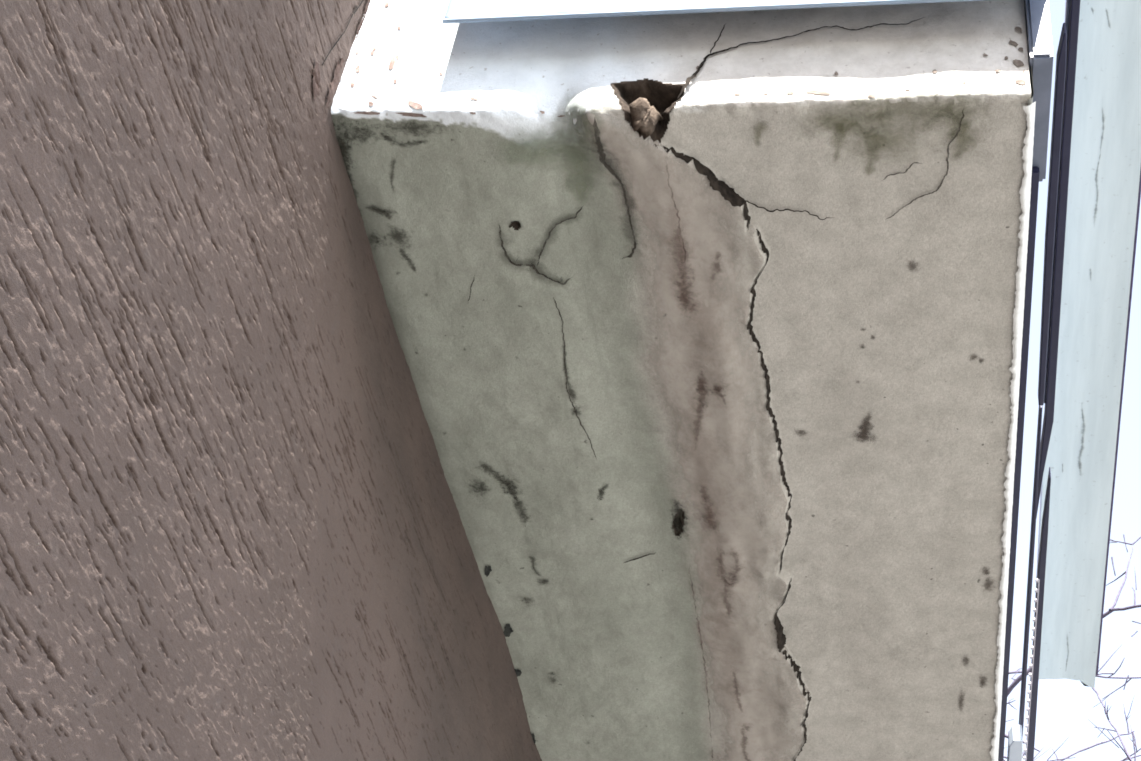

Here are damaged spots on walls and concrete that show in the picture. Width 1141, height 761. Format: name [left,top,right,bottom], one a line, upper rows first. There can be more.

crack [593,117,636,259]
spalling [611,78,685,148]
crack [672,17,924,103]
crack [882,109,964,219]
crack [499,205,596,457]
crack [663,145,829,761]